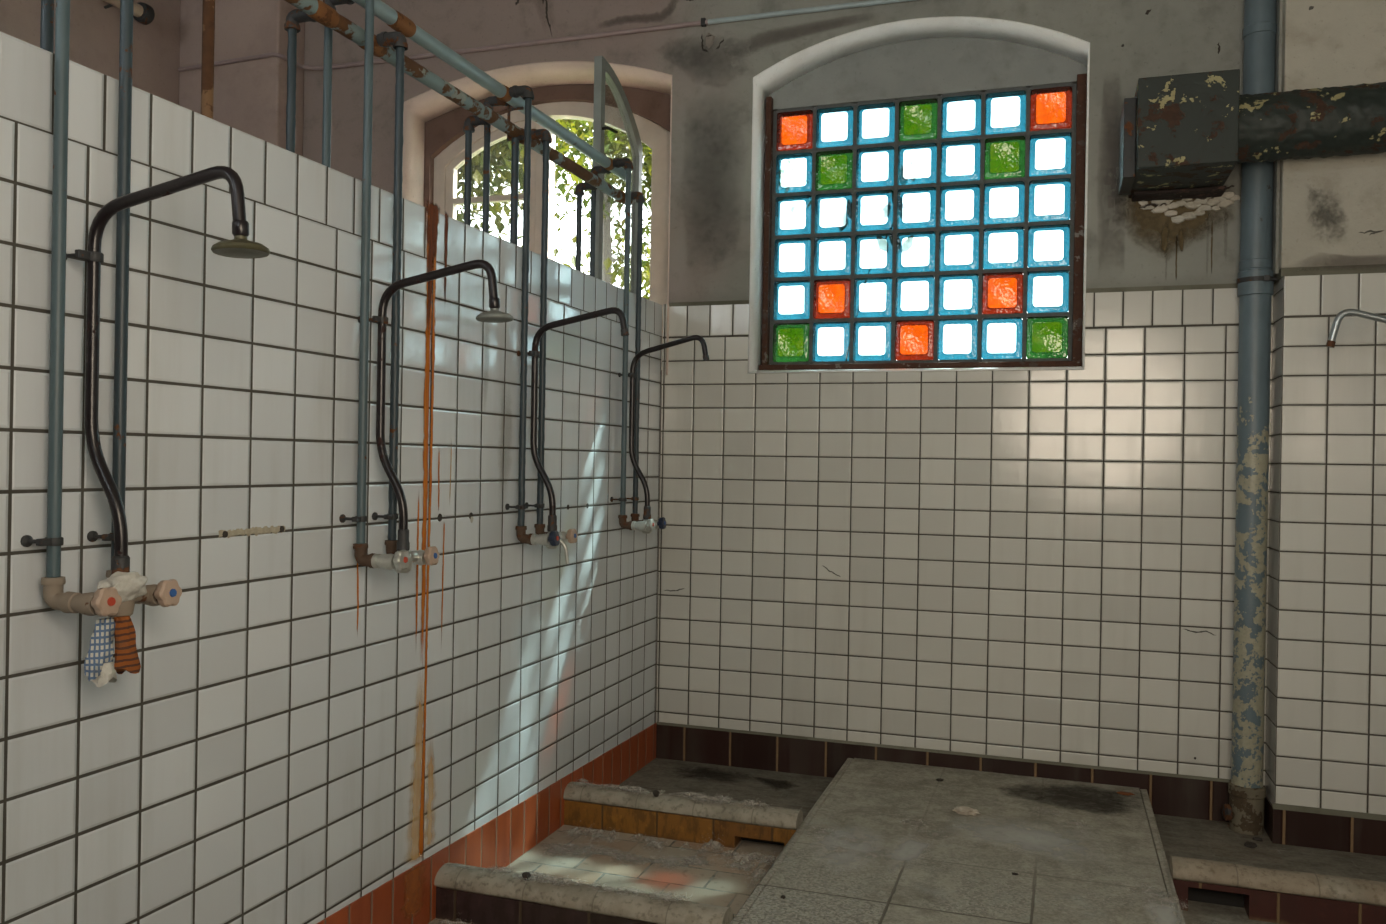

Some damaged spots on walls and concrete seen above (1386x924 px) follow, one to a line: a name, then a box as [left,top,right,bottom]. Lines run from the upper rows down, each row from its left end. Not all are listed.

crack [515,0,552,36]
water stain [1123,196,1229,278]
corrosion [403,201,448,916]